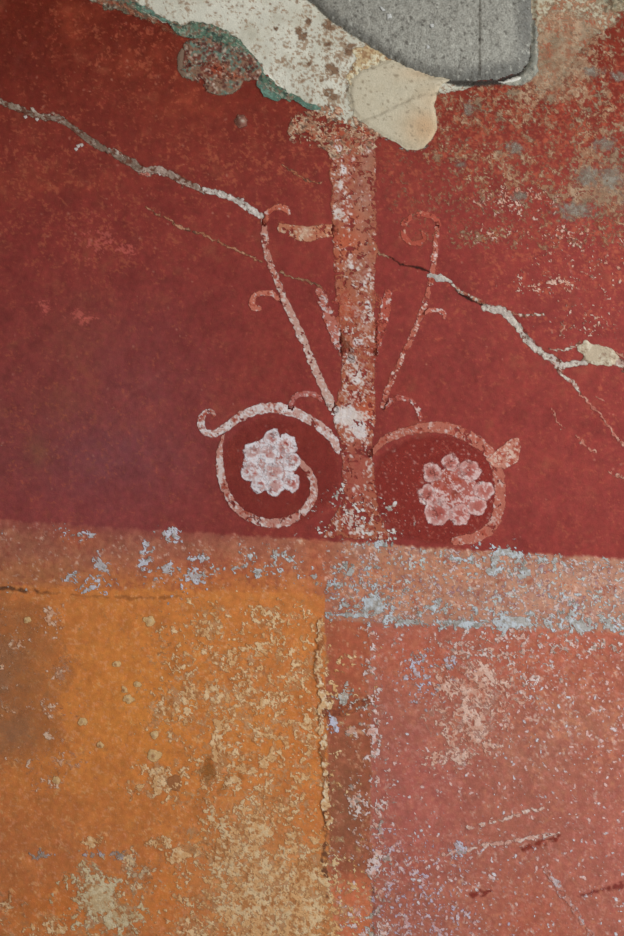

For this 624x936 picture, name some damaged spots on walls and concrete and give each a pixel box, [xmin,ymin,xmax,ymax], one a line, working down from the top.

crack [0,98,264,219]
crack [145,206,323,290]
flaking render [90,0,400,128]
crack [366,242,624,479]
peeling [412,0,624,250]
peeling [0,579,397,936]